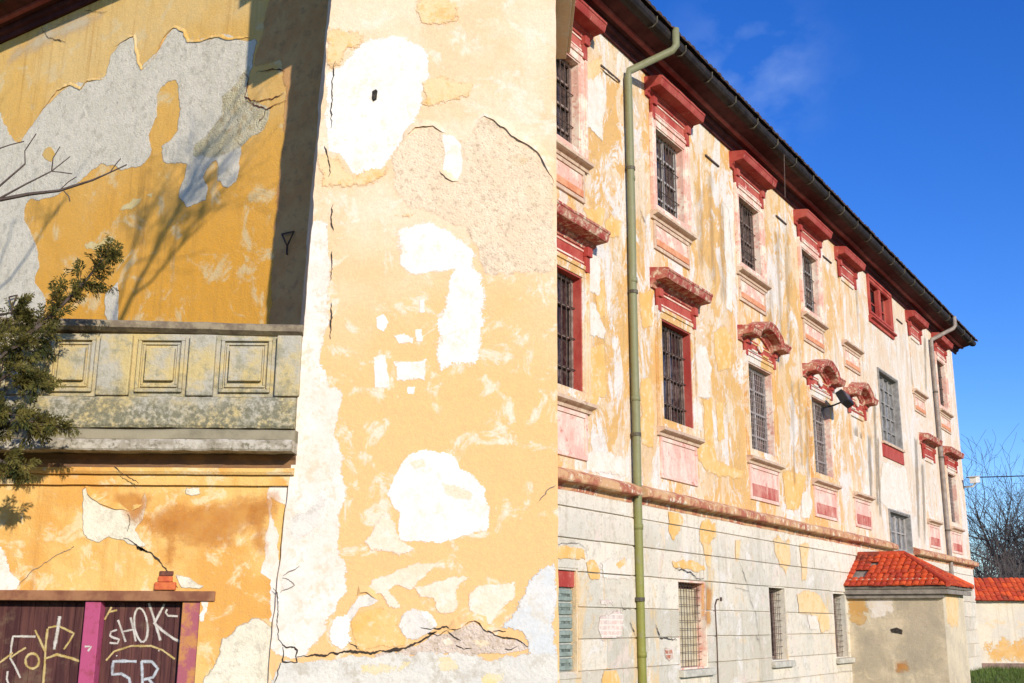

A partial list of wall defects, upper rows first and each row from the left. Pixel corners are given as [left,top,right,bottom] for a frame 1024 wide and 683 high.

crack [244,68,284,121]
crack [324,63,335,177]
flaking render [0,0,558,683]
crack [125,515,204,589]
crack [273,566,528,683]